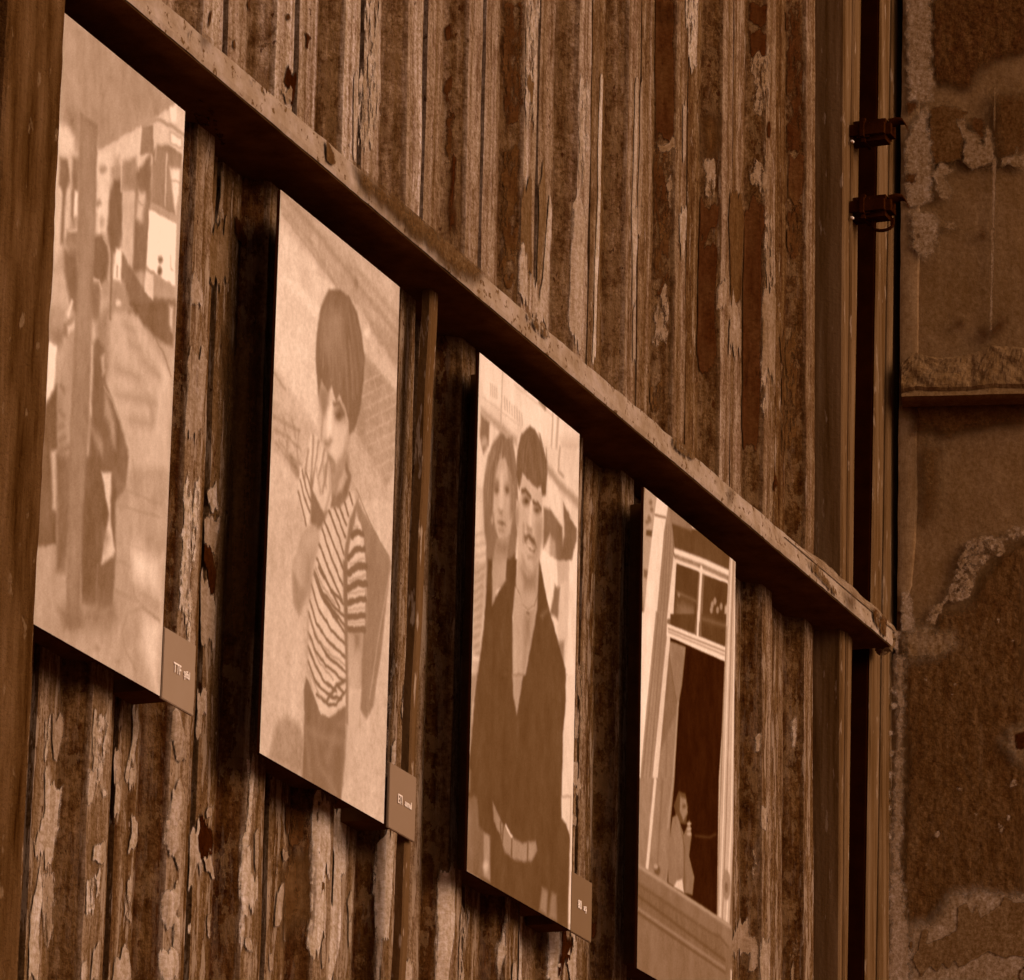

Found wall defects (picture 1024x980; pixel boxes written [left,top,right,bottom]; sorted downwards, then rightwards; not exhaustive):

peeling [519,159,552,331]
peeling [568,75,590,354]
peeling [749,154,776,417]
spalling [904,0,1024,260]
peeling [29,712,64,980]
peeling [87,704,139,853]
peeling [113,944,131,980]
peeling [188,806,215,890]
peeling [239,753,259,952]
peeling [307,790,353,980]
peeling [372,829,394,980]
spalling [889,541,1024,980]